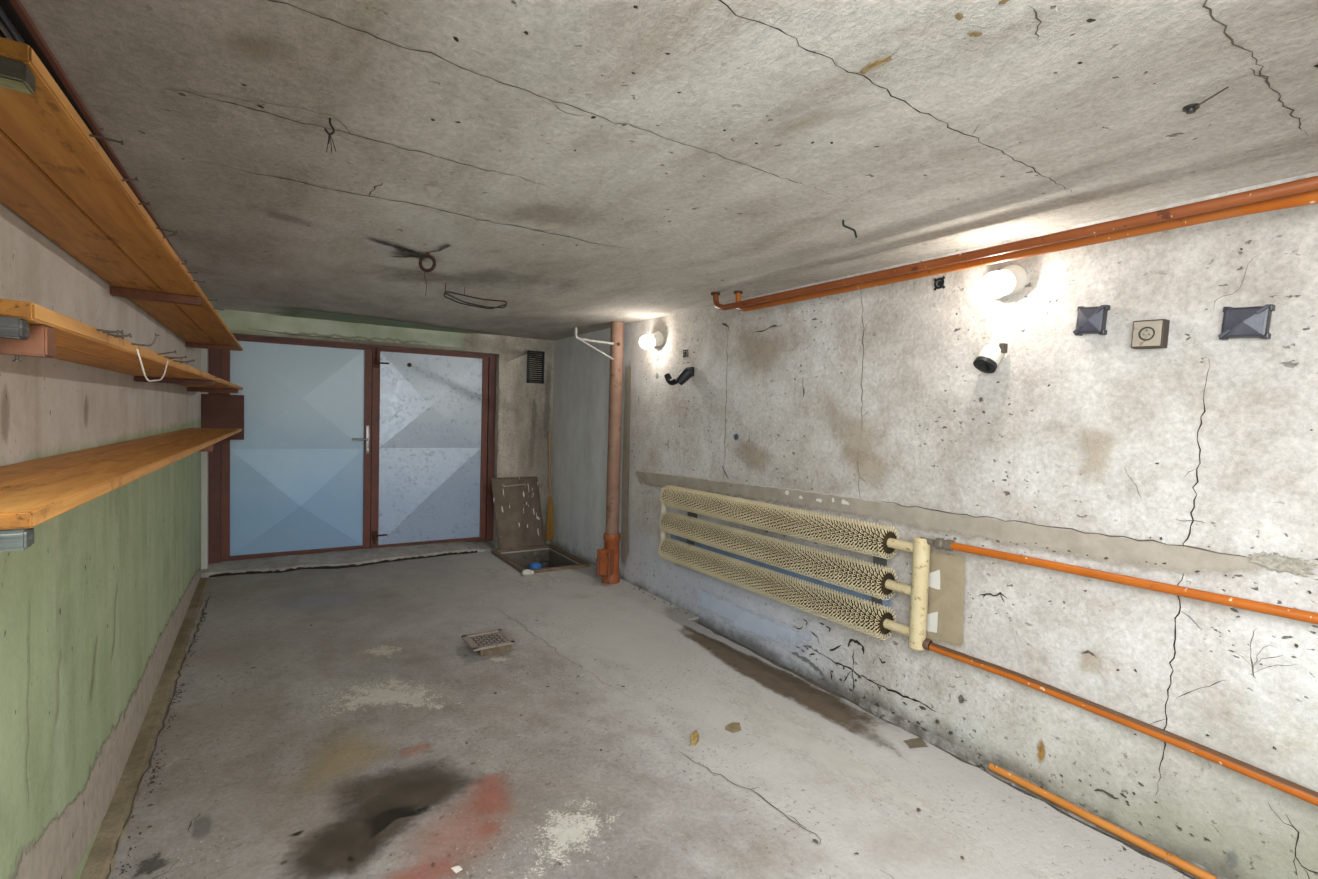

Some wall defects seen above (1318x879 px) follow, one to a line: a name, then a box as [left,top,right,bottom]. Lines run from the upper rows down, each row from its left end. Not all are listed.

crack [167,89,546,186]
crack [268,0,828,194]
crack [719,0,1072,193]
crack [1202,0,1308,136]
crack [1151,362,1296,796]
peeling [10,570,202,879]
crack [1268,803,1318,879]